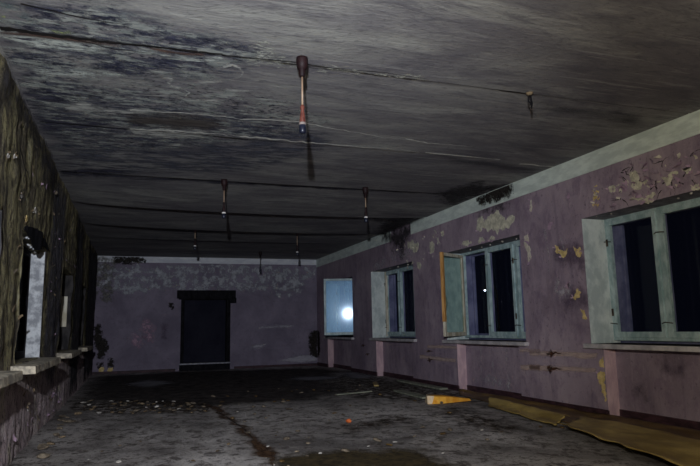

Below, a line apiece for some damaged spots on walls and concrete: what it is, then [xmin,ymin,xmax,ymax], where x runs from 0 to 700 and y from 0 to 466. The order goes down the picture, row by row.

crack [21,3,129,26]
crack [0,27,620,106]
leakage [437,181,514,212]
peeling [591,149,700,214]
leakage [372,218,418,269]
peeling [462,210,515,250]
spalling [553,245,582,258]
peeling [97,263,317,298]